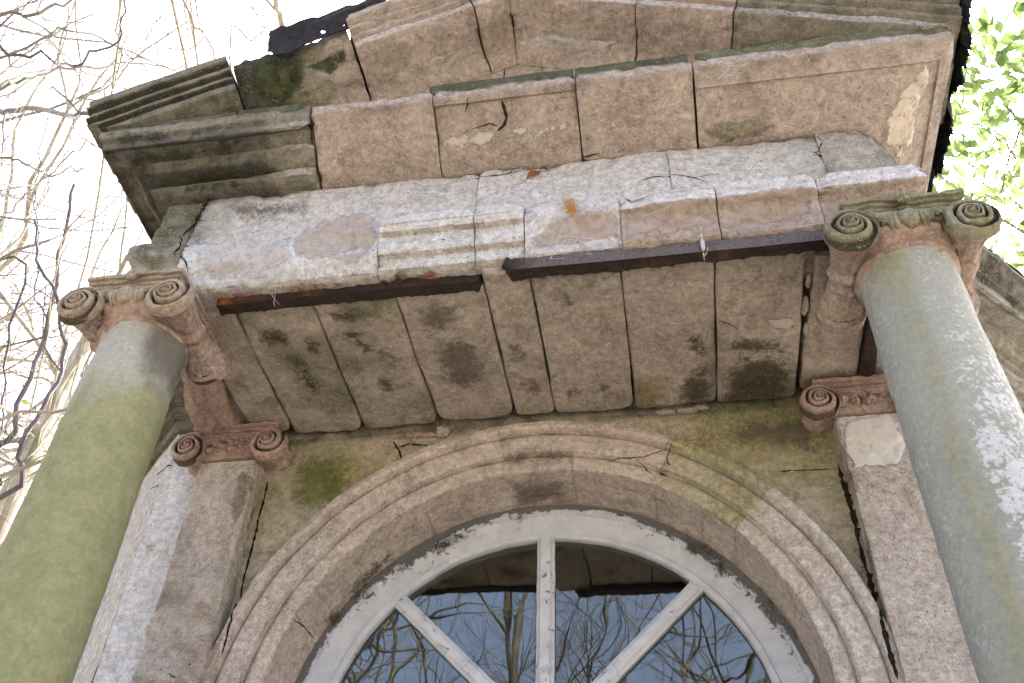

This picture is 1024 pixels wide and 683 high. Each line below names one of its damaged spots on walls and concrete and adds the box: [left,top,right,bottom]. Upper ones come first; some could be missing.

crack [465,98,508,131]
spalling [884,65,929,159]
crack [642,173,719,182]
crack [173,198,209,272]
damp [438,342,484,387]
damp [679,335,791,412]
damp [293,462,340,504]
crack [604,442,672,476]
flaking render [845,414,905,469]
crack [222,482,268,654]
crack [781,462,898,680]